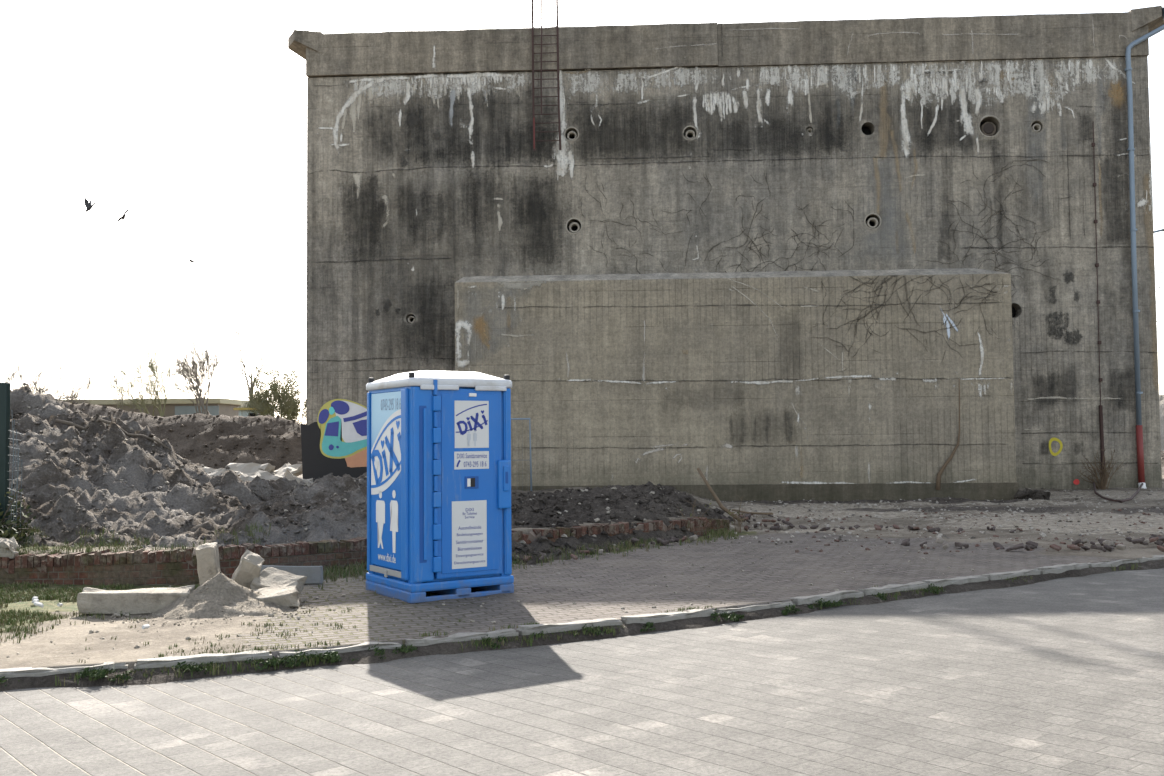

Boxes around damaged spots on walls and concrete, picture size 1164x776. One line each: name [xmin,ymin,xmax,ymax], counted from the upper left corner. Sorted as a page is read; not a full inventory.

water stain [318,47,1135,256]
water stain [1046,272,1082,345]